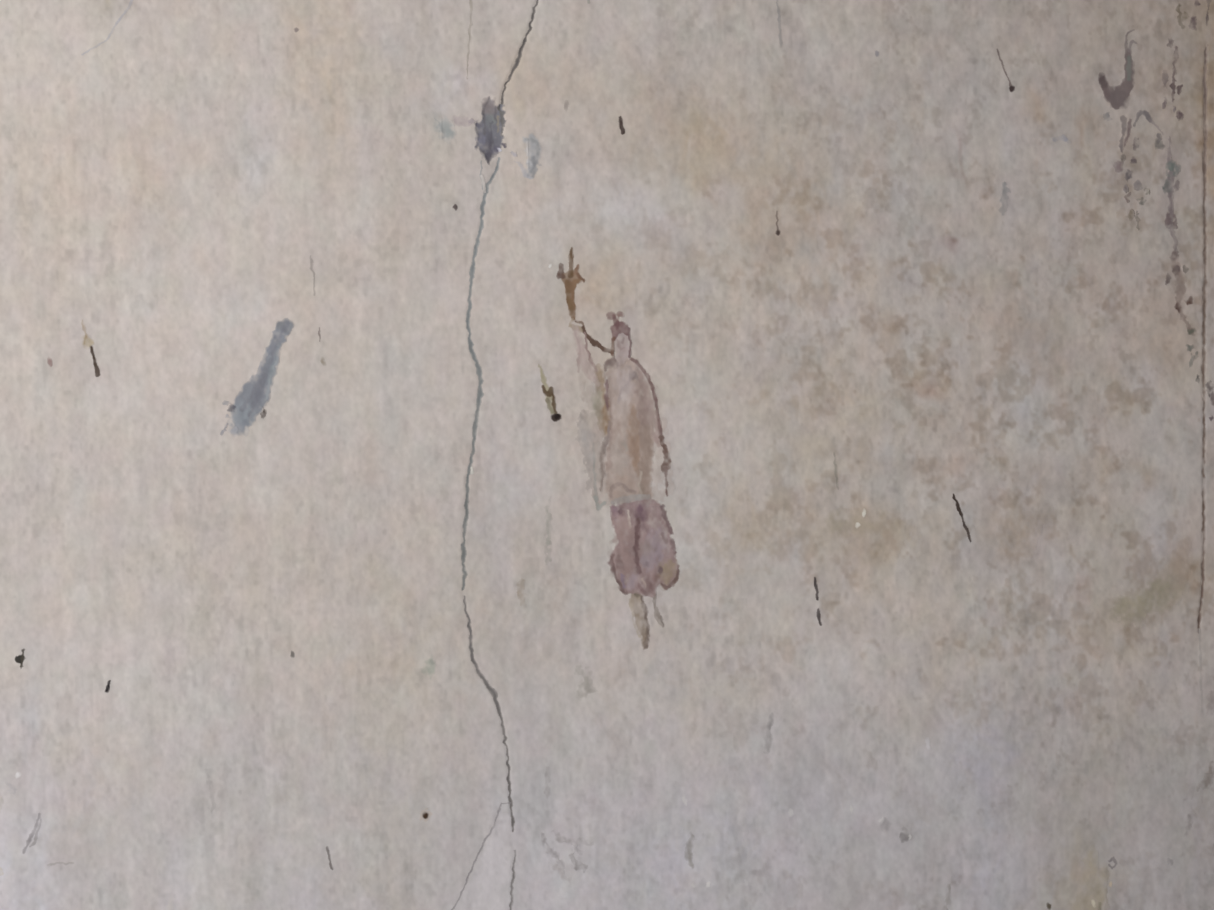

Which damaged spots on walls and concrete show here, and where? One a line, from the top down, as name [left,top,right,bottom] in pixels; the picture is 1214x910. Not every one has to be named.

crack [465,0,473,79]
crack [500,0,539,104]
water stain [514,132,542,180]
water stain [220,318,294,438]
crack [451,157,516,910]